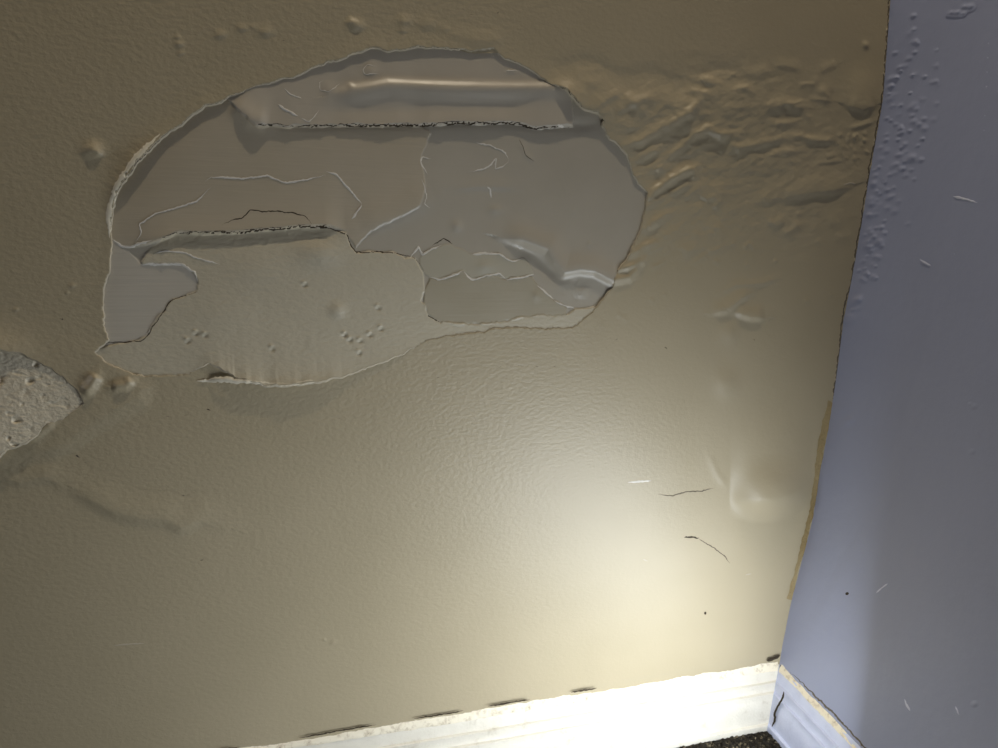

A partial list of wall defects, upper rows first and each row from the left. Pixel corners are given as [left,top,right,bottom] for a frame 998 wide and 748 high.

spalling [0,349,84,458]
peeling [62,10,648,427]